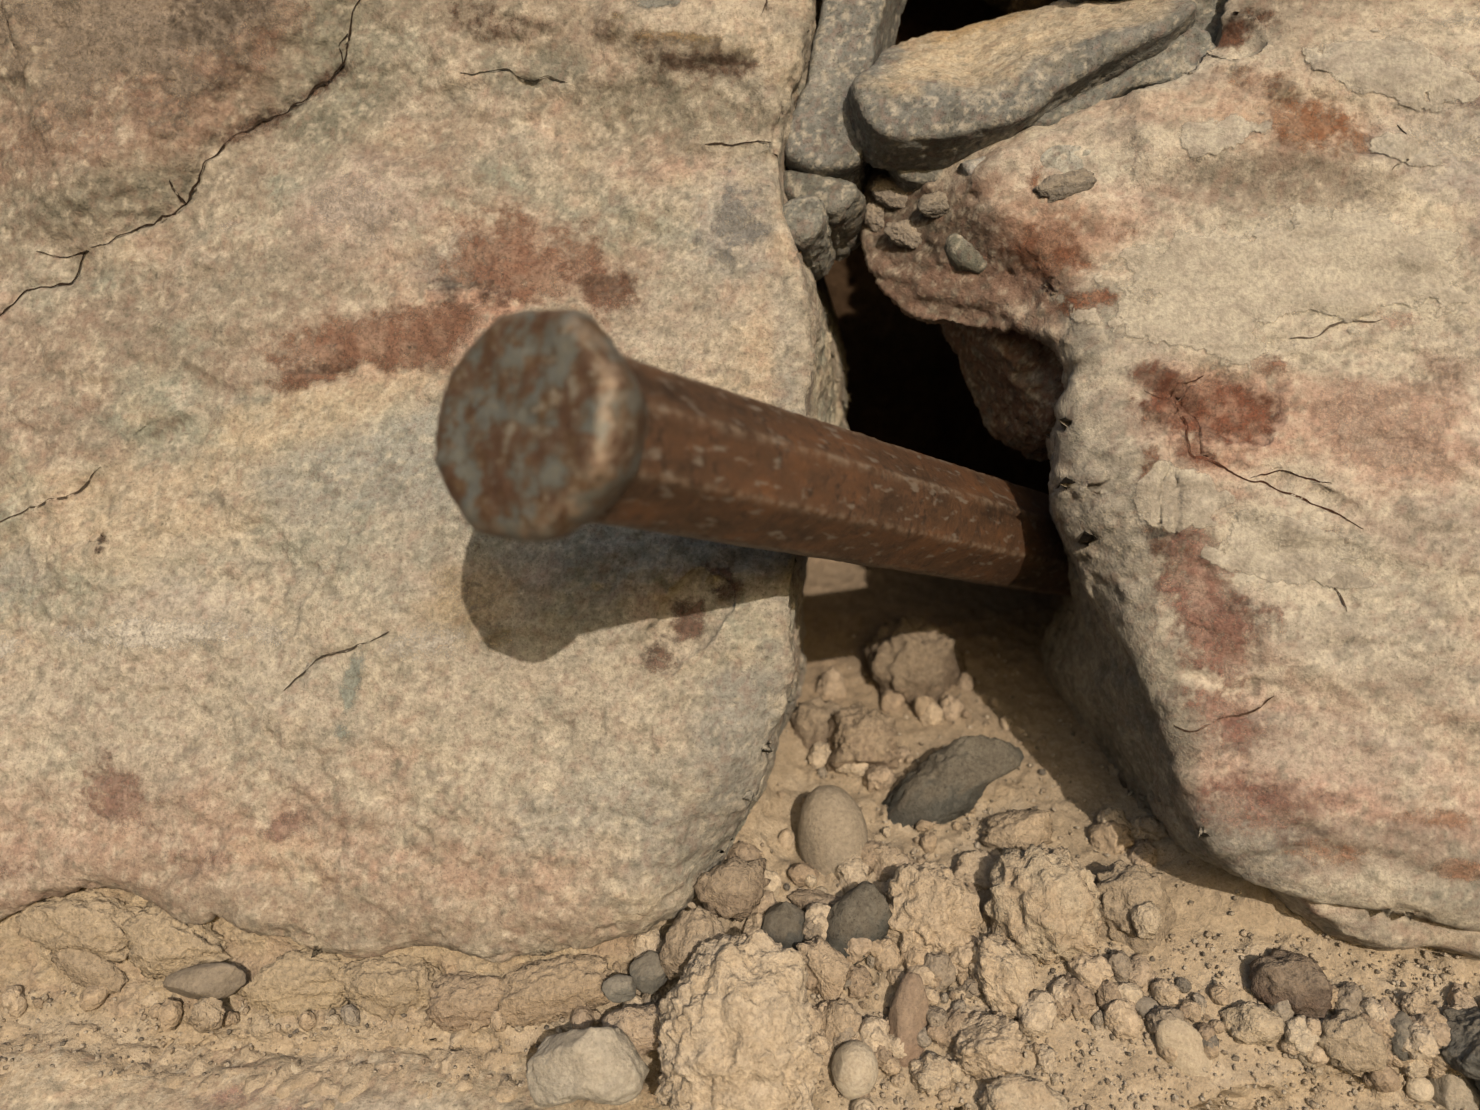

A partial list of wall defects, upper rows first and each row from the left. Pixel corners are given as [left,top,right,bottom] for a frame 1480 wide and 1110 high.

crack [0,0,360,316]
crack [0,467,100,522]
crack [1145,375,1363,529]
crack [284,631,390,691]